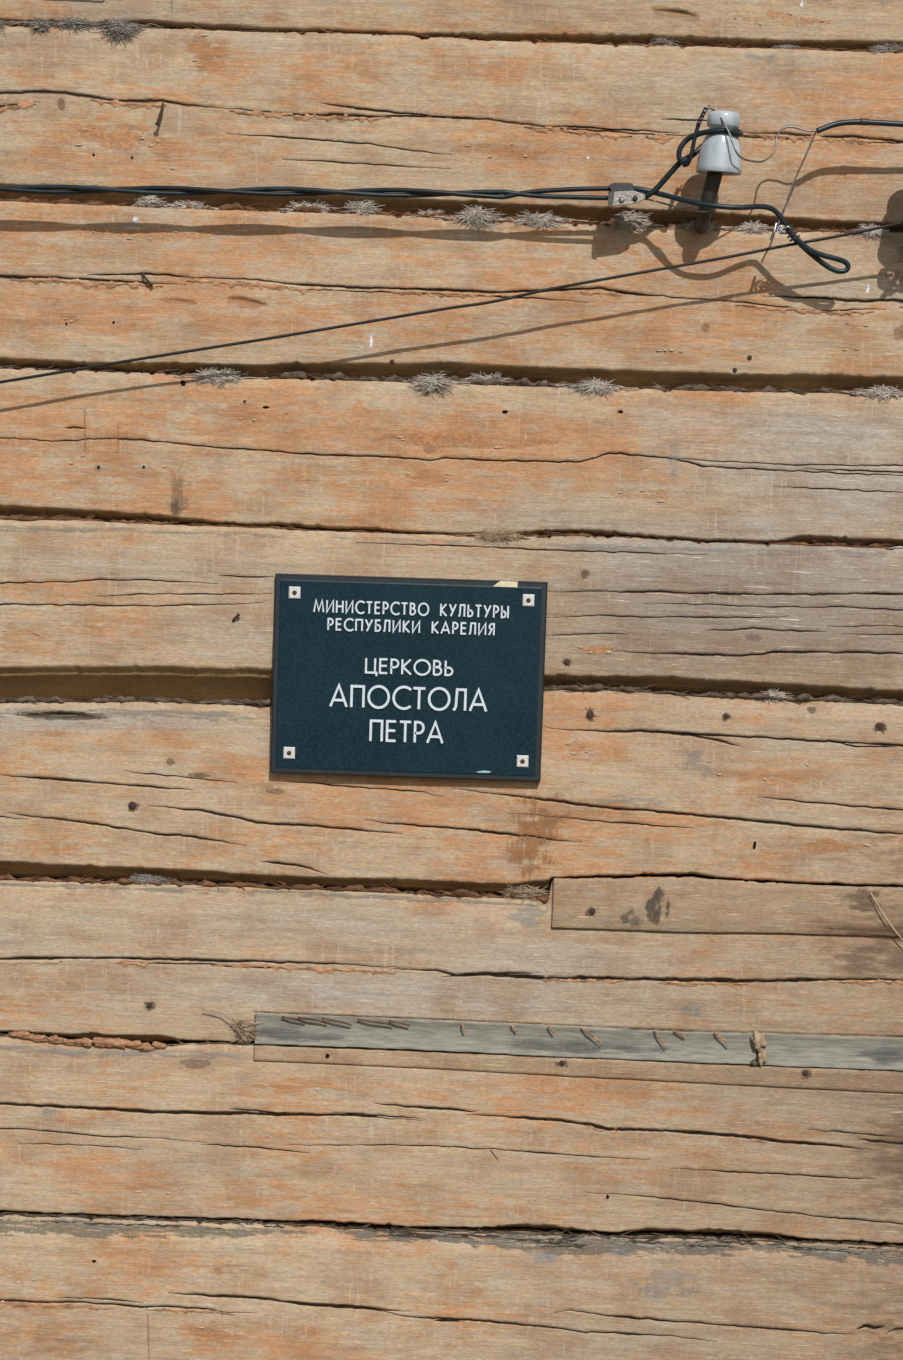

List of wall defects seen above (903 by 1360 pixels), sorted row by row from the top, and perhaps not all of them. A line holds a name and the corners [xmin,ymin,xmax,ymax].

crack [0,90,707,169]
crack [0,273,903,316]
crack [545,726,903,747]
crack [0,771,903,875]
crack [0,1103,903,1224]
crack [0,1292,903,1342]